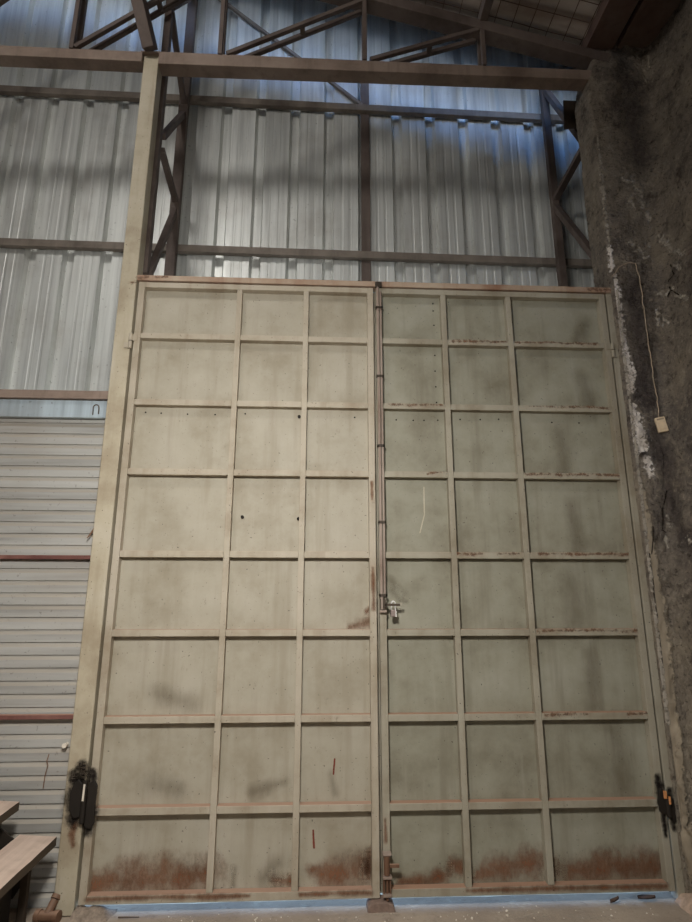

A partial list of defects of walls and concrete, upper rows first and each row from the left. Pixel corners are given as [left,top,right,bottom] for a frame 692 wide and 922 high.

leakage [596,131,670,725]
rust [86,859,249,901]
rust [299,851,371,896]
rust [399,860,463,885]
rust [472,852,668,892]